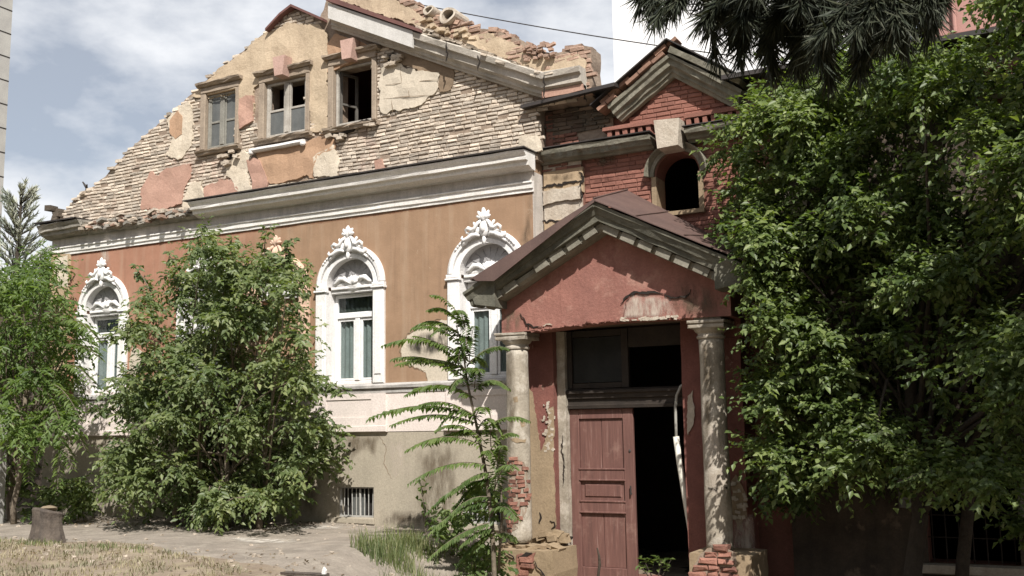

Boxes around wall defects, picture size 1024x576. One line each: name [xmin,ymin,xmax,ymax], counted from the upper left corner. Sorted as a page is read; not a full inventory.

flaking render [44,0,617,224]
peeling [399,319,448,381]
crack [520,313,552,332]
crack [620,289,691,322]
peeling [542,401,555,452]
flaking render [506,457,532,533]
flaking render [688,429,751,576]